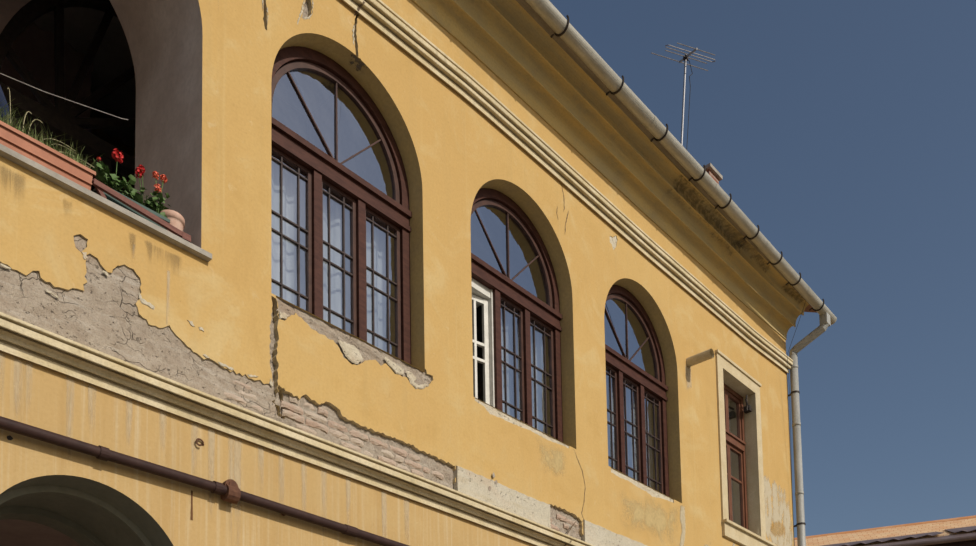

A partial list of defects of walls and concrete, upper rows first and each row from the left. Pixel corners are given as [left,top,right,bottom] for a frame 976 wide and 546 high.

crack [261,0,269,30]
crack [297,0,314,24]
crack [350,0,366,71]
peeling [0,234,456,489]
flaking render [550,504,583,540]
crack [564,453,586,546]